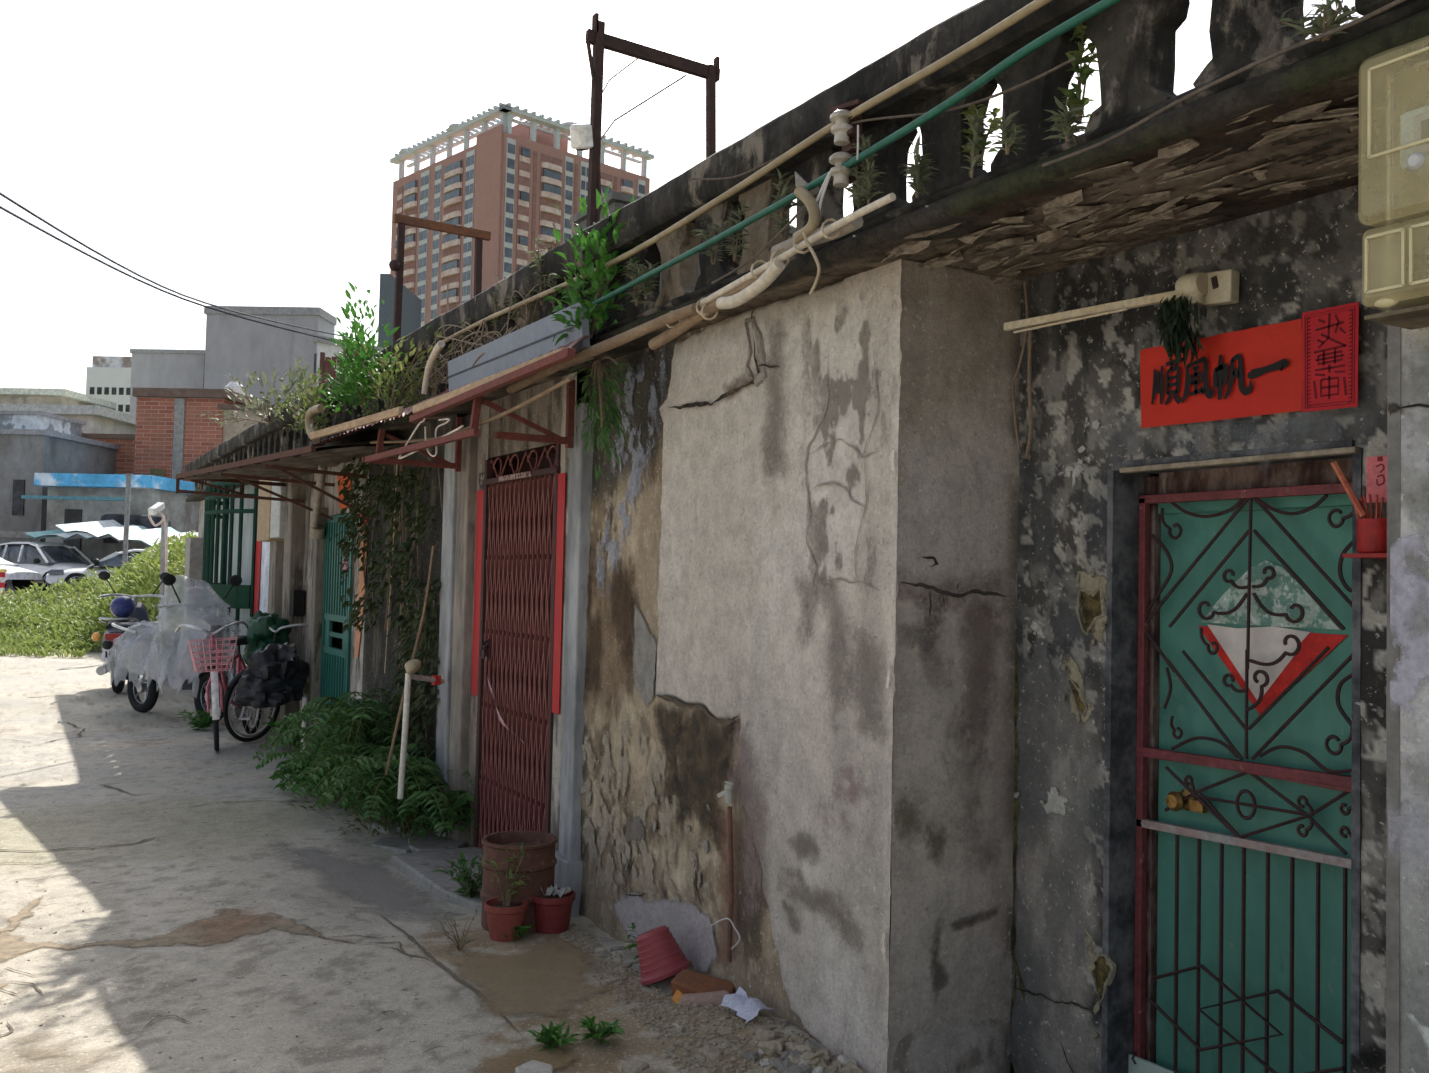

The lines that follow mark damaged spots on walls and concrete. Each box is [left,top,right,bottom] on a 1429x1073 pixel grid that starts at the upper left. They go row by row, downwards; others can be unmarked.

peeling [881,84,1387,285]
crack [670,307,779,409]
water stain [727,322,782,473]
water stain [583,360,665,699]
water stain [801,321,880,730]
crack [901,556,1007,616]
flaking render [653,694,738,726]
peeling [580,712,710,902]
water stain [792,835,816,855]
crack [0,897,42,932]
crack [328,912,524,1039]
spalling [1084,928,1116,1014]